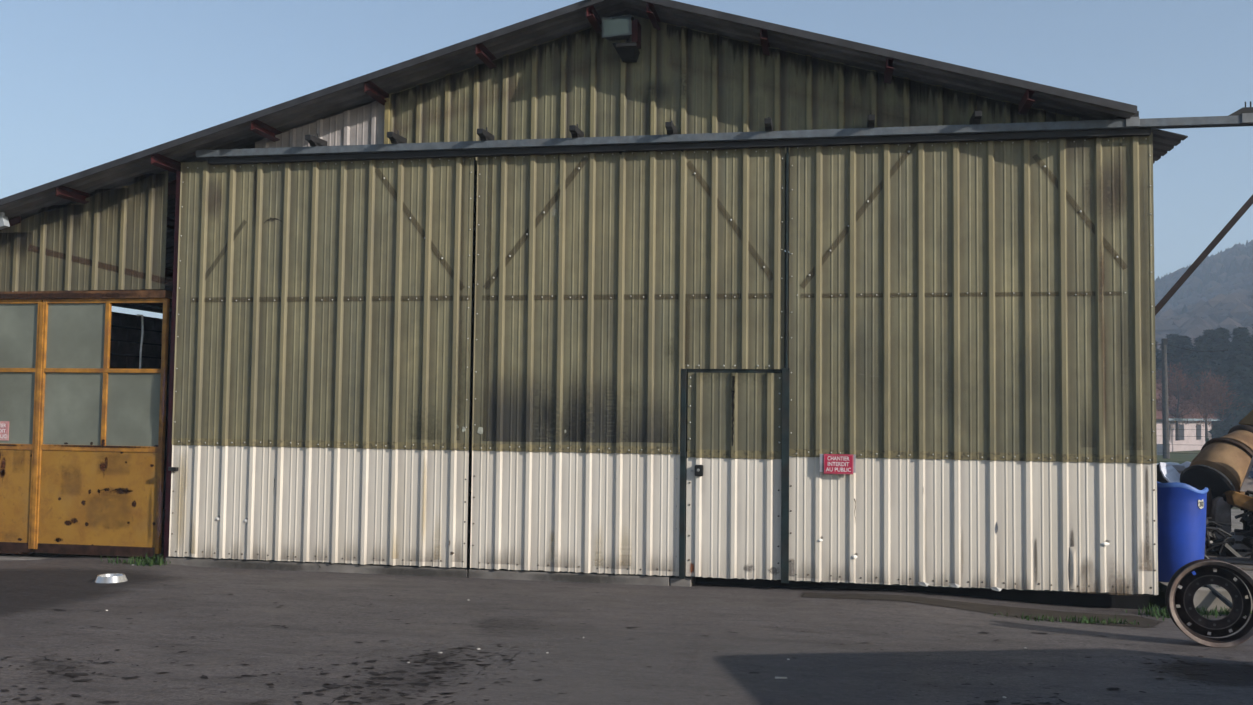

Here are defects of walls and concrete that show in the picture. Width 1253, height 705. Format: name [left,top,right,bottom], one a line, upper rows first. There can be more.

corrosion [0,444,17,477]
corrosion [55,439,158,471]
corrosion [81,488,136,507]